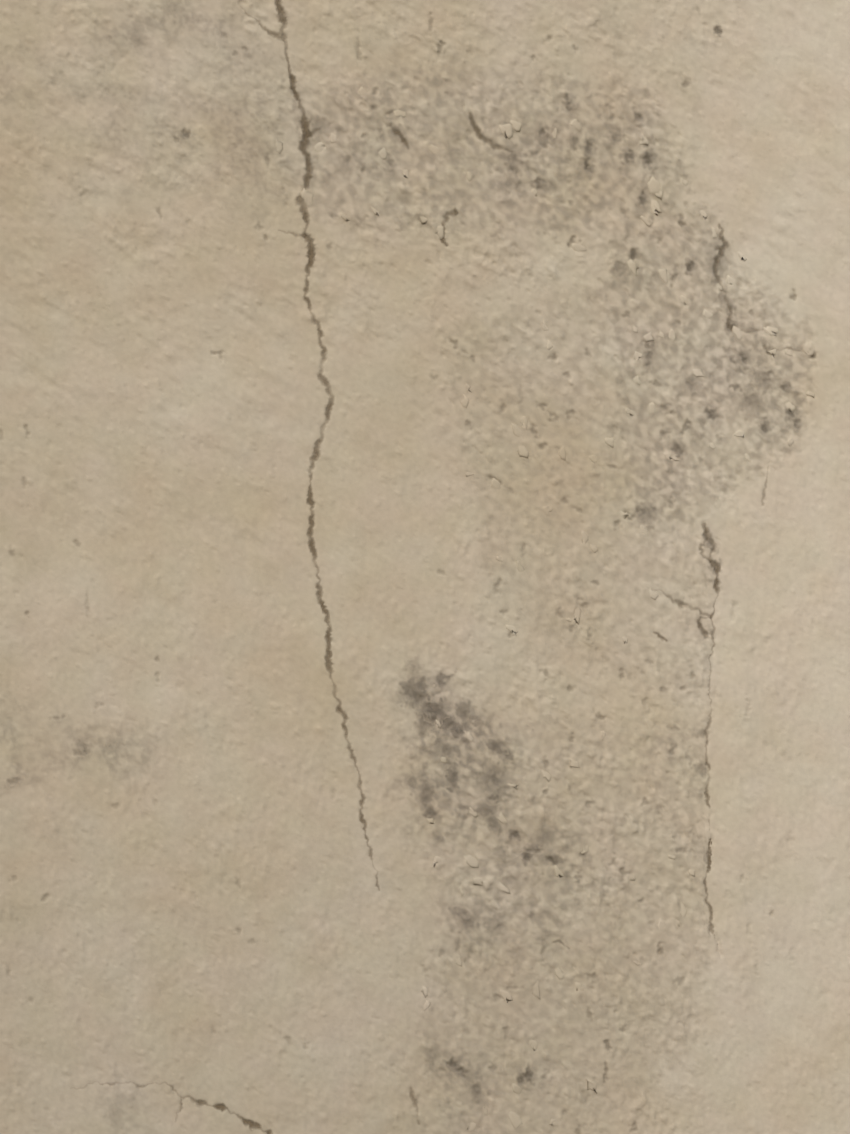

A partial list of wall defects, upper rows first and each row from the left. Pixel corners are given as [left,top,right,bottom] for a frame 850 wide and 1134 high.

crack [276,0,284,22]
crack [289,70,325,352]
crack [313,380,332,459]
crack [307,487,316,557]
crack [317,585,331,672]